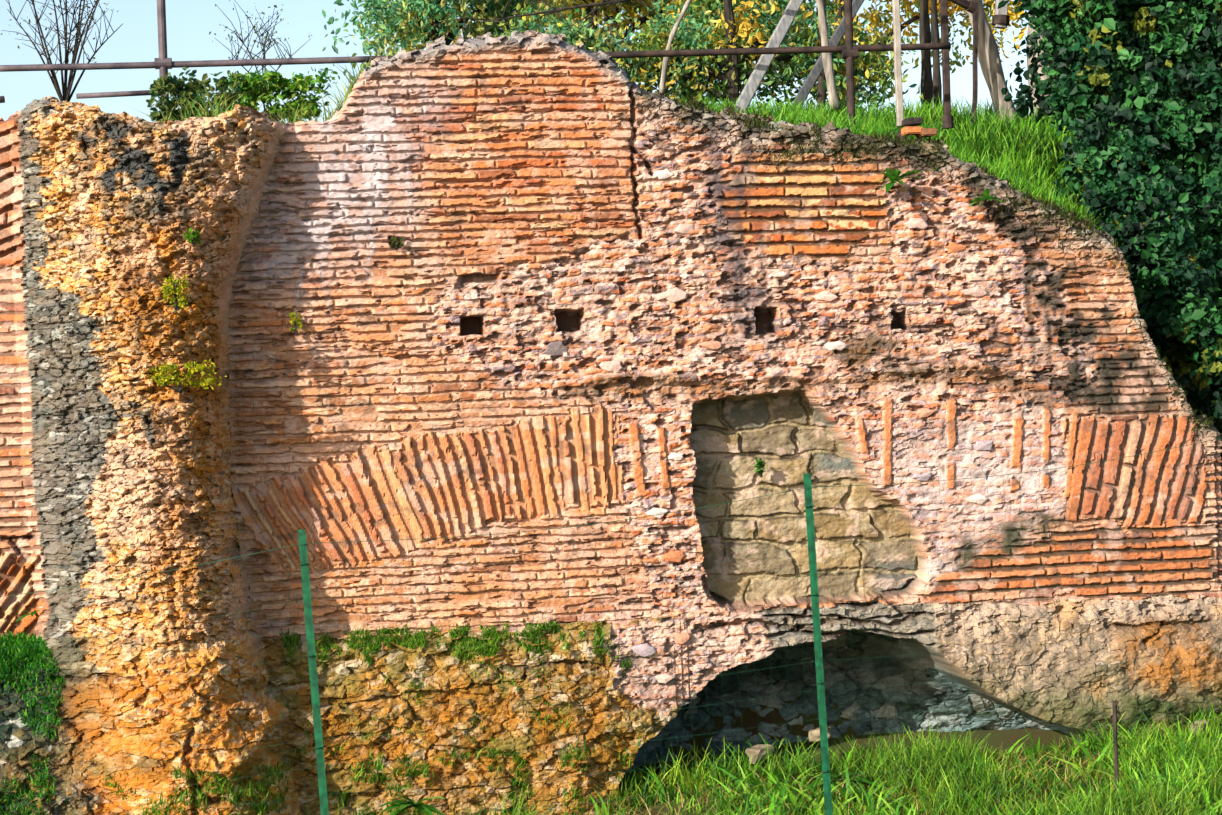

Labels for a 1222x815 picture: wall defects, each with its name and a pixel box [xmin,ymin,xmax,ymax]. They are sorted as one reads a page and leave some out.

crack [628,79,654,240]
spalling [429,104,1101,716]